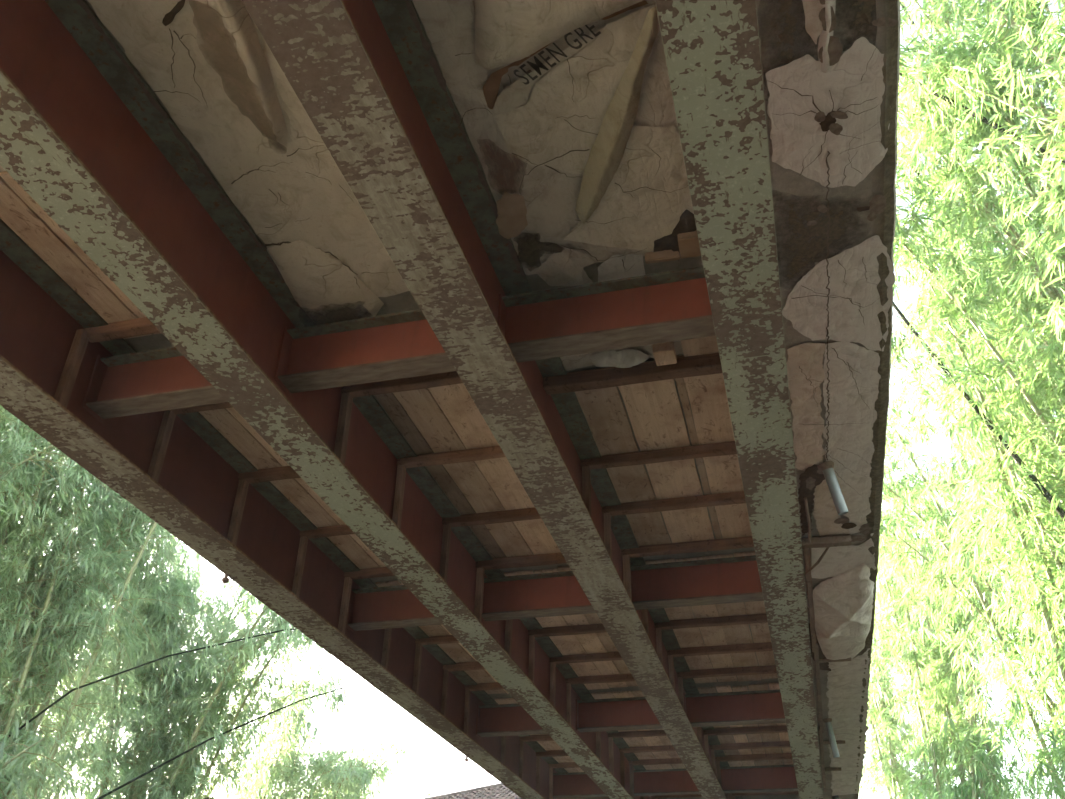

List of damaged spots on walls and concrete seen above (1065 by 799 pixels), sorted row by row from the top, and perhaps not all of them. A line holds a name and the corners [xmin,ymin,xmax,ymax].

spalling [162,0,185,26]
crack [154,28,207,104]
spalling [818,0,843,66]
crack [512,59,598,202]
spalling [814,111,848,135]
crack [231,145,353,246]
crack [318,248,393,288]
crack [767,47,885,496]
peeling [0,84,630,799]
peeling [242,0,726,799]
peeling [654,0,831,799]